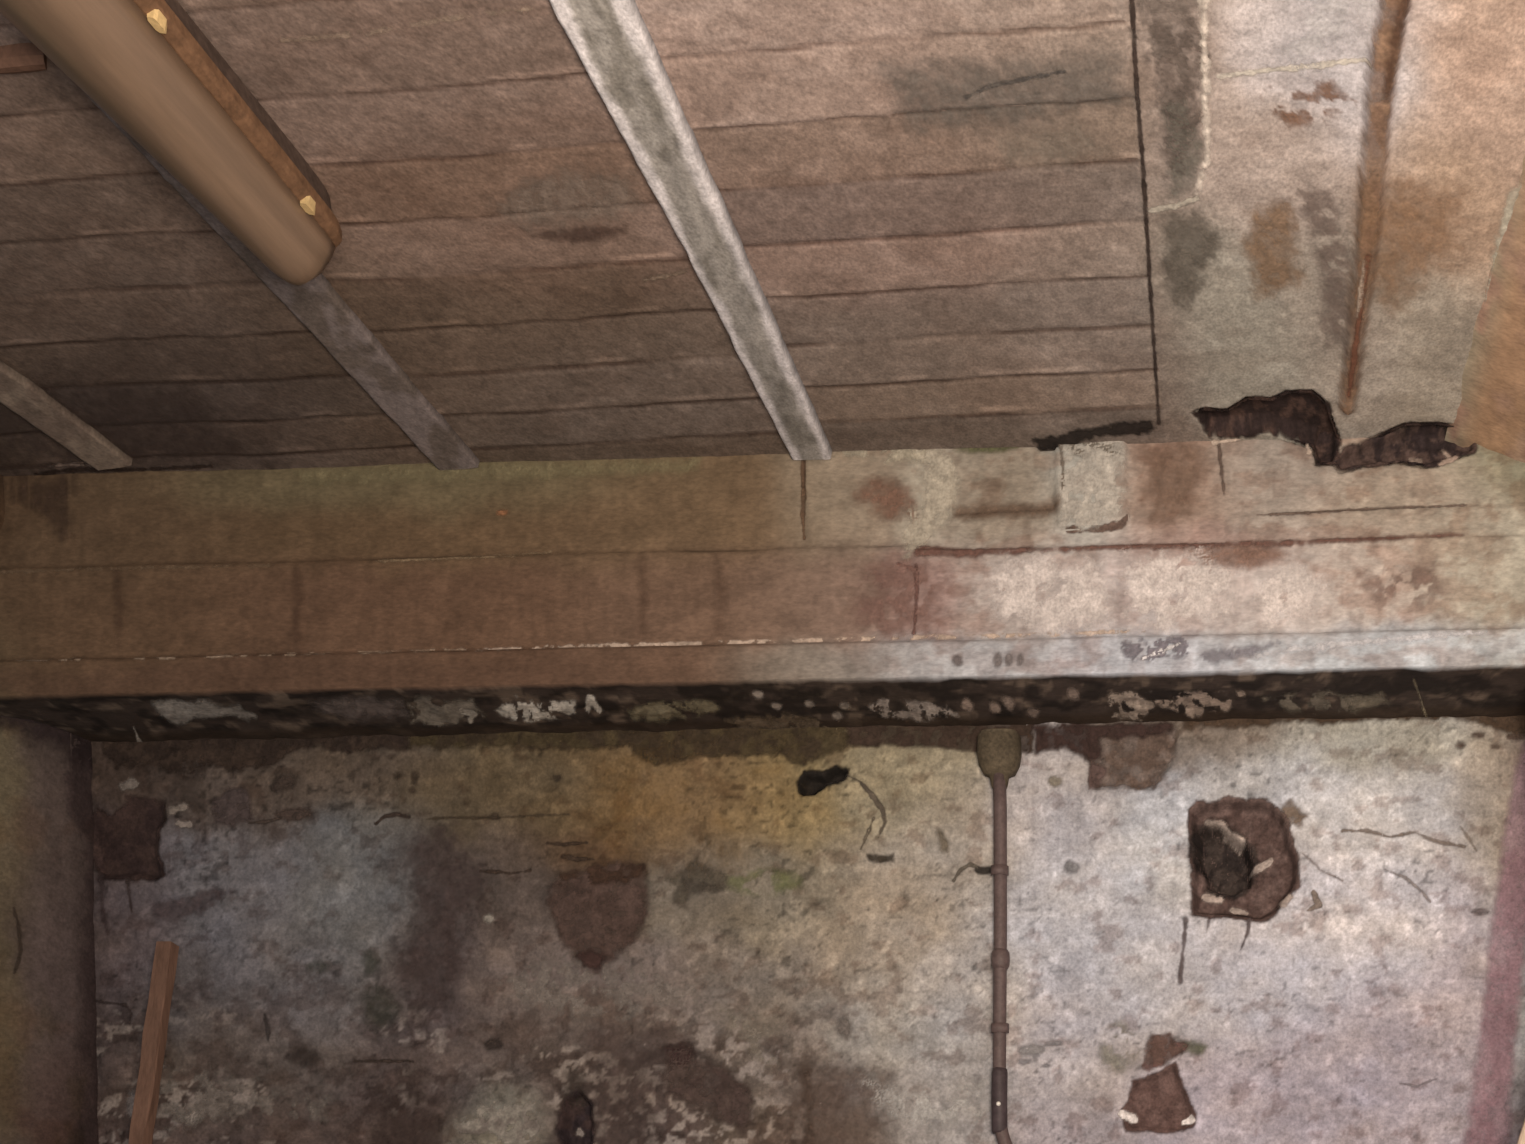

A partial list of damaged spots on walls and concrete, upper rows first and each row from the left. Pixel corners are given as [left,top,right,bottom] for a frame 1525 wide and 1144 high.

leakage [1129,0,1374,303]
crack [1129,0,1161,425]
spalling [1192,389,1477,491]
peeling [154,700,257,724]
peeling [311,697,479,726]
peeling [497,694,602,723]
peeling [629,691,850,730]
flaking render [870,691,1245,790]
spalling [93,778,193,912]
spalling [1178,795,1307,984]
spalling [555,1071,595,1144]
spalling [1102,1030,1206,1133]